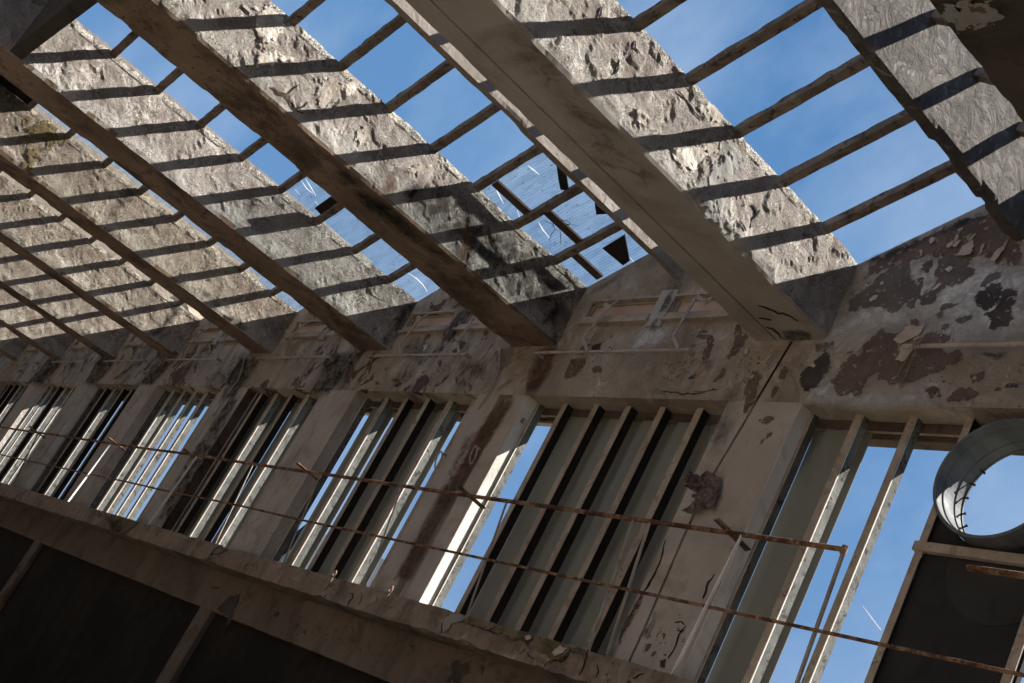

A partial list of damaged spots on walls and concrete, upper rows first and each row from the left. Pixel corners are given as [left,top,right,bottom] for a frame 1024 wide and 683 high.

leakage [22,114,73,171]
crack [758,305,798,339]
peeling [784,214,1024,402]
peeling [564,325,615,379]
peeling [713,324,767,413]
crack [441,540,666,678]
crack [632,621,686,679]